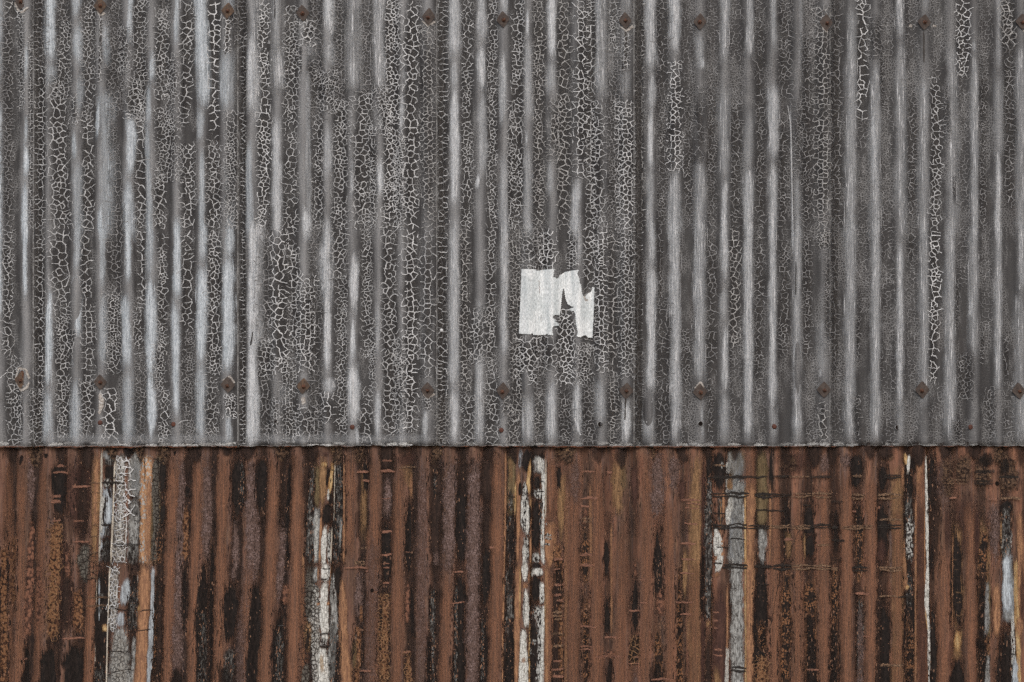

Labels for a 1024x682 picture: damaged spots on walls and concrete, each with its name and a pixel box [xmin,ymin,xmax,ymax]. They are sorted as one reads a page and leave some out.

crack [0,0,1024,446]
corrosion [0,453,107,682]
peeling [0,441,271,682]
peeling [302,442,353,682]
corrosion [134,449,1024,682]
peeling [498,442,836,682]